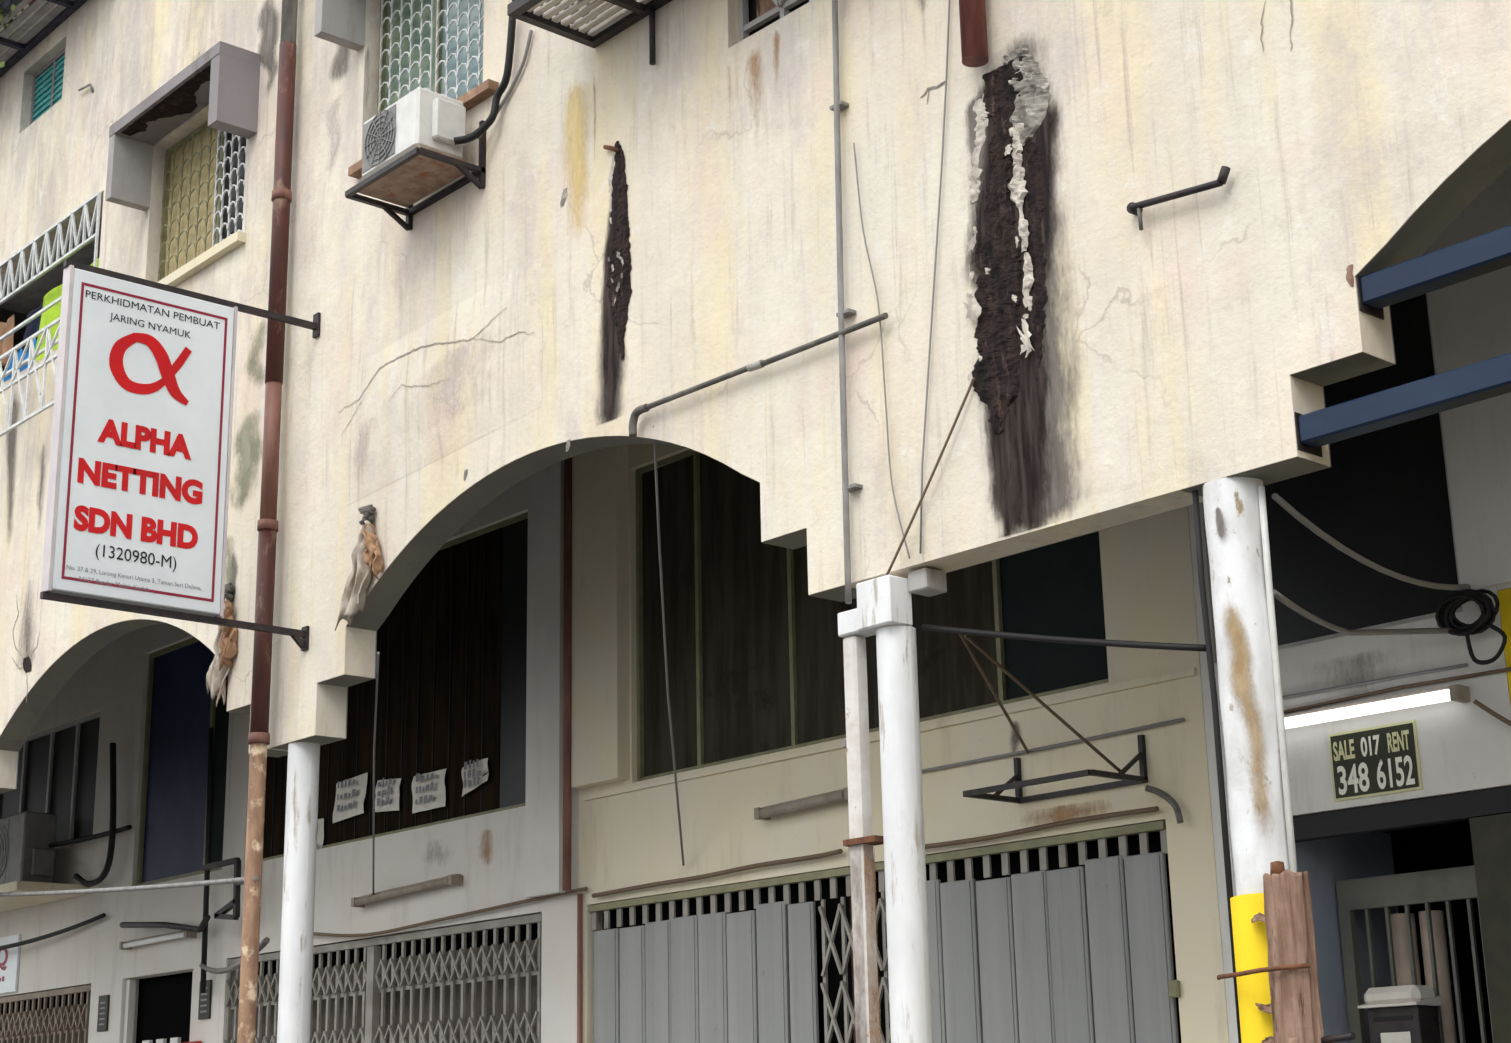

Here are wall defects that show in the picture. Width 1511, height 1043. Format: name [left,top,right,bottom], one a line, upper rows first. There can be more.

water stain [567,88,595,212]